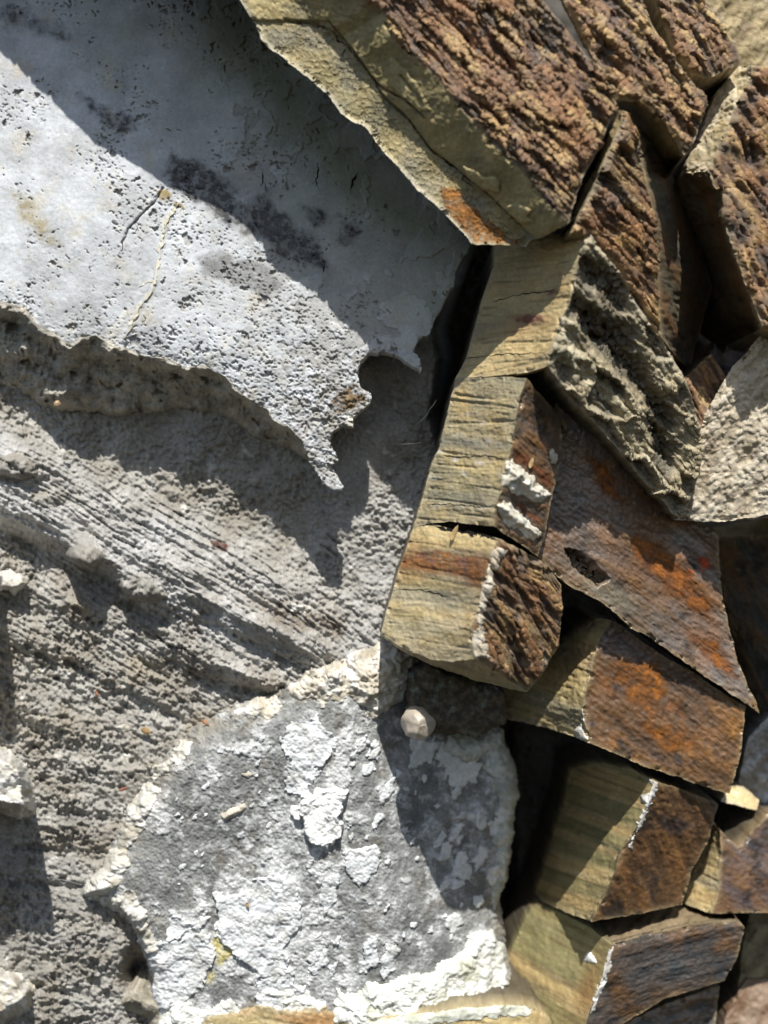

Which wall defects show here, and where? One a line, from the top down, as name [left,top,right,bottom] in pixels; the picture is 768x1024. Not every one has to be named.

crack [118,189,184,340]
spalling [0,301,309,460]
peeling [280,713,505,917]
peeling [147,874,341,1011]
peeling [358,922,433,980]
peeling [443,895,484,940]